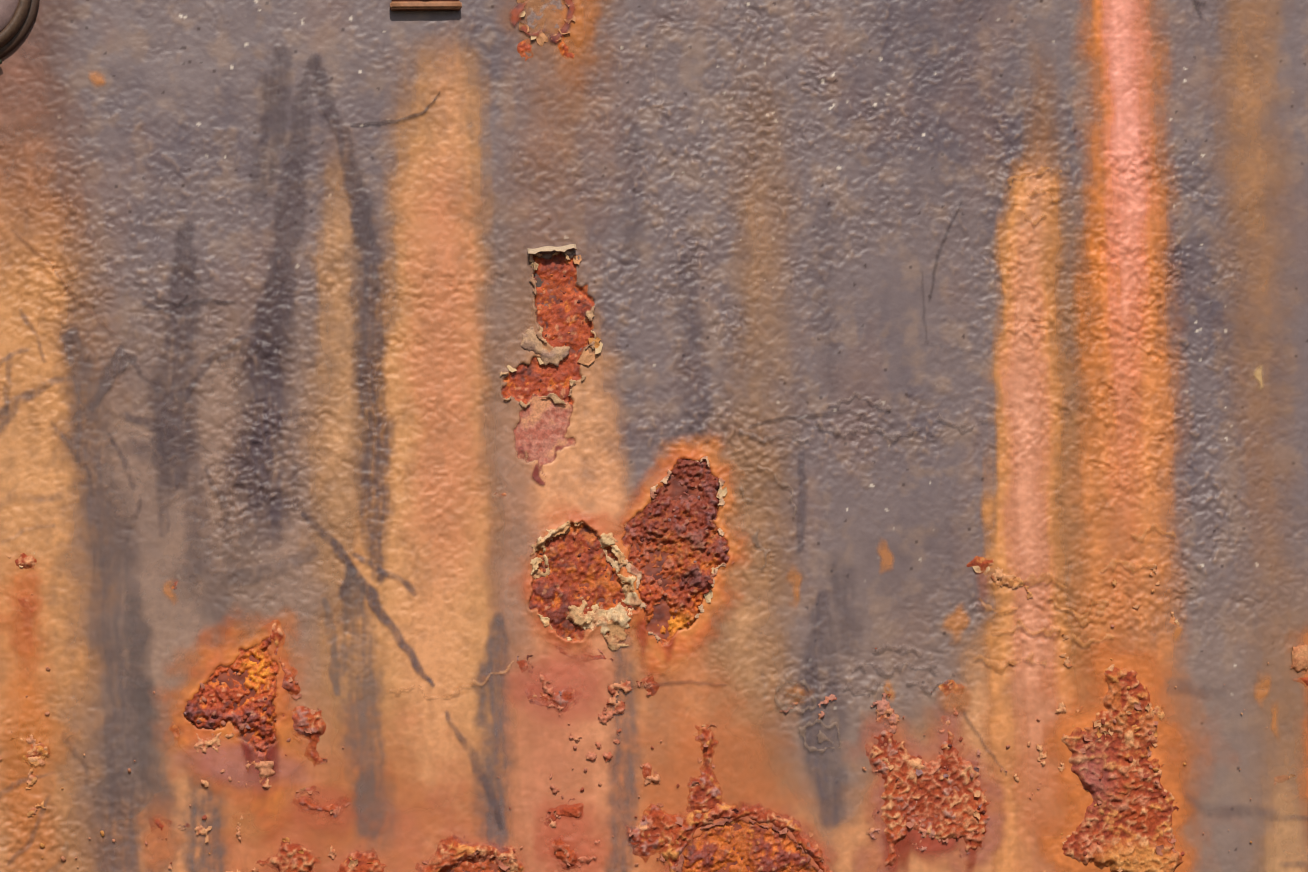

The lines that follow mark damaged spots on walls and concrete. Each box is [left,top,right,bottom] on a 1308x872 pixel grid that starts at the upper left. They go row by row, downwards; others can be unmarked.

rust [529,0,592,70]
rust [0,0,90,872]
damp [65,330,136,596]
damp [144,223,195,487]
damp [240,80,305,525]
damp [316,67,378,295]
rust [98,53,629,872]
damp [331,343,433,684]
peeling [500,244,603,485]
peeling [524,439,743,673]
rust [613,0,1191,872]
rust [1290,632,1308,688]